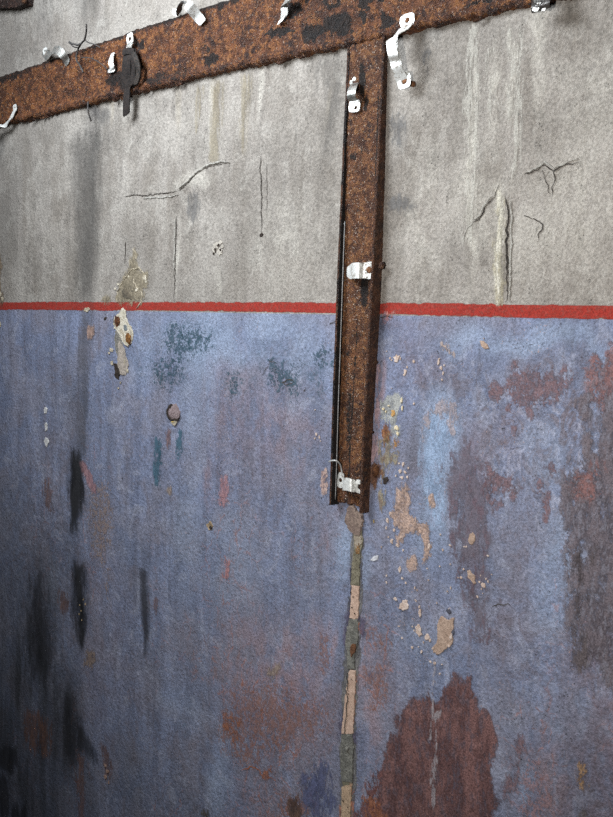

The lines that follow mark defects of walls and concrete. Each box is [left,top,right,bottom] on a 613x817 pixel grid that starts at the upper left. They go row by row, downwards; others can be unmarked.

corrosion [0,0,534,125]
crack [124,161,227,199]
crack [525,158,581,195]
crack [170,219,178,298]
crack [463,184,543,301]
spalling [101,248,148,389]
peeling [371,462,454,675]
peeling [458,568,492,598]